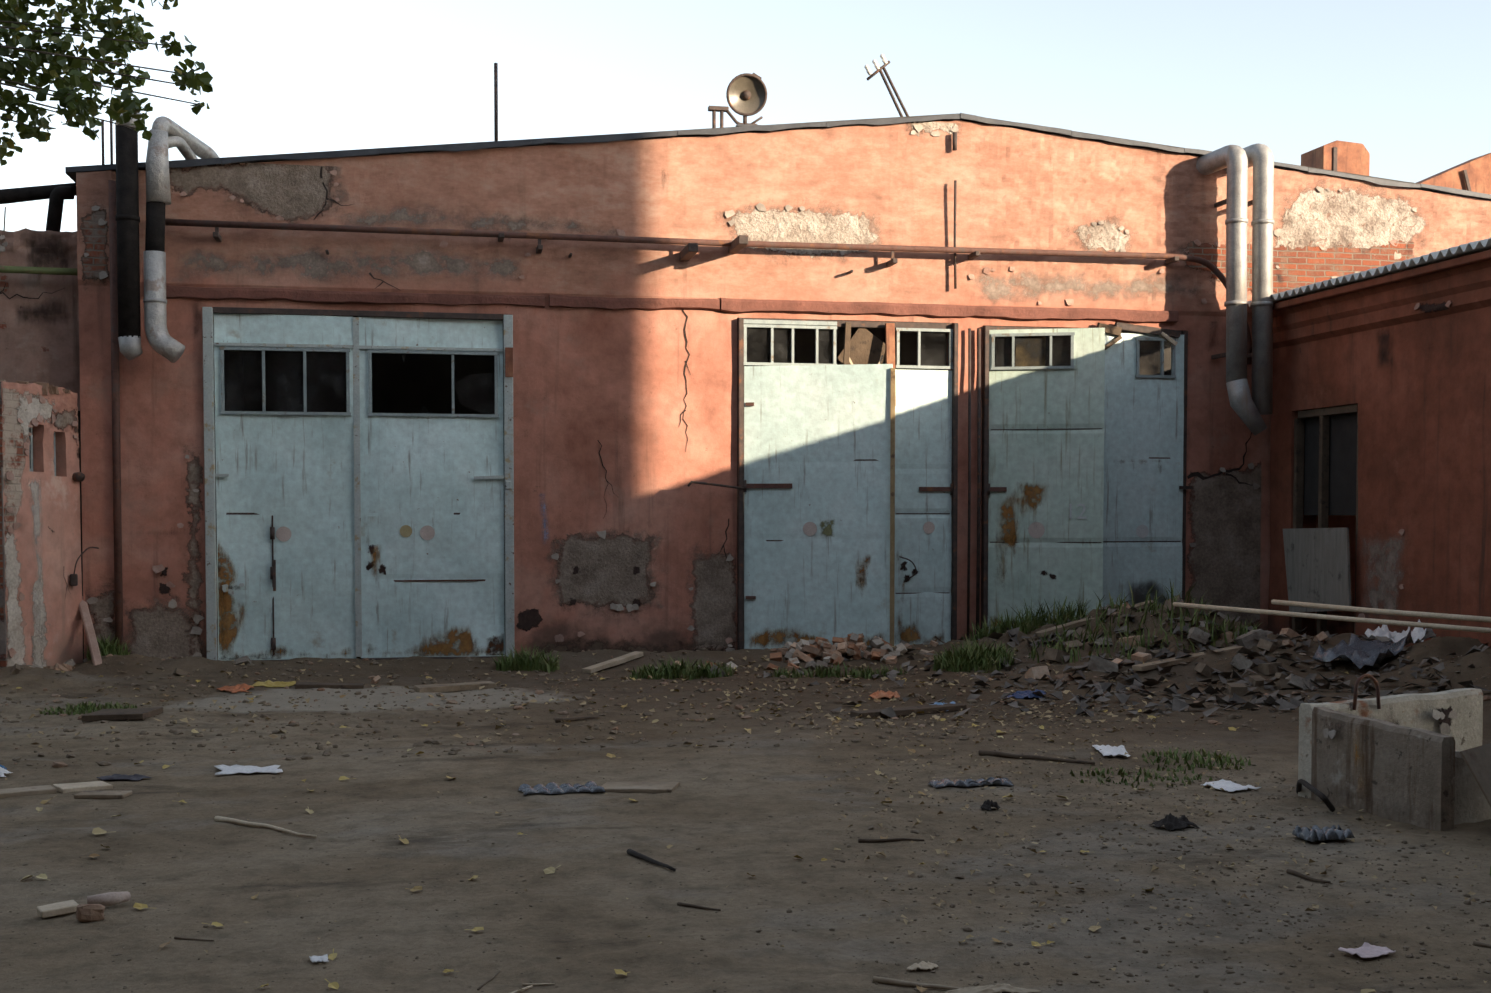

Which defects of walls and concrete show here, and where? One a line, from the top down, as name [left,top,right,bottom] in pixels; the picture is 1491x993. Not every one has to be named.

flaking render [169,163,345,223]
spalling [725,203,880,260]
flaking render [1181,239,1226,282]
spalling [1273,183,1426,293]
flaking render [0,388,76,671]
flaking render [87,455,204,659]
spalling [549,530,662,612]